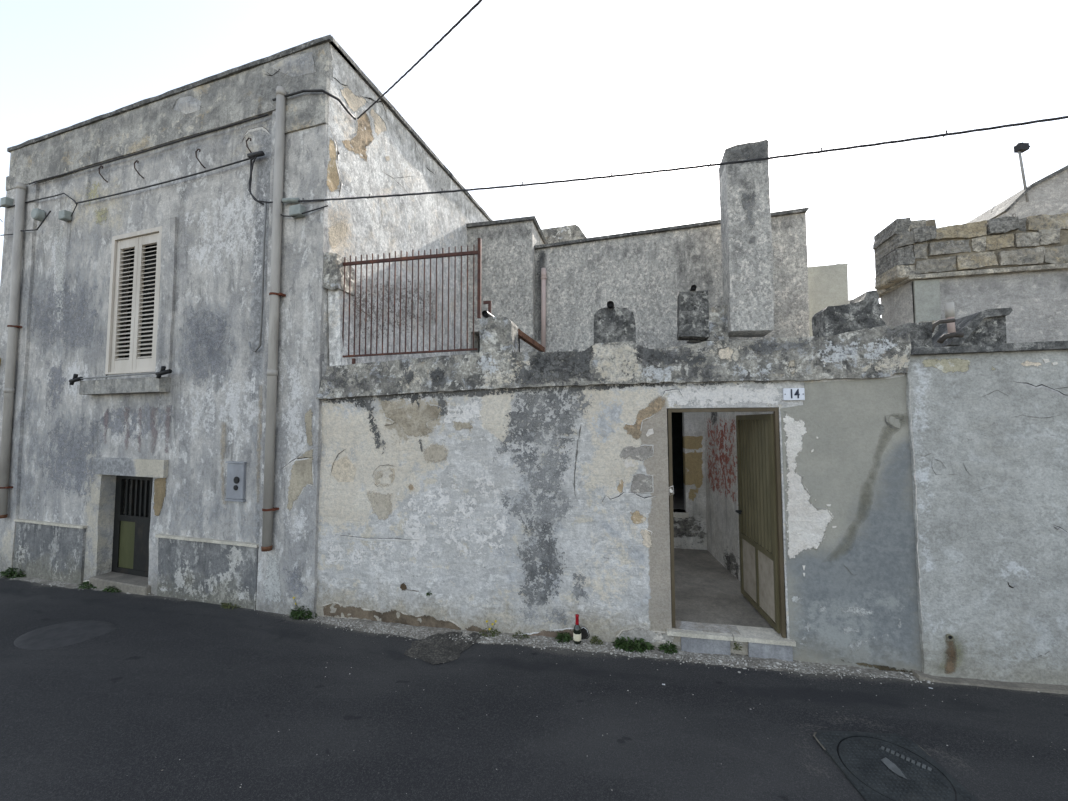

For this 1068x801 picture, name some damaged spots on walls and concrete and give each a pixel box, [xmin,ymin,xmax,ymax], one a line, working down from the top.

peeling [326,85,387,193]
water stain [536,250,546,337]
peeling [920,358,974,373]
crack [987,382,1068,418]
water stain [321,347,778,626]
peeling [617,397,665,494]
peeling [783,413,837,576]
spalling [322,602,493,633]
corrosion [945,641,956,674]